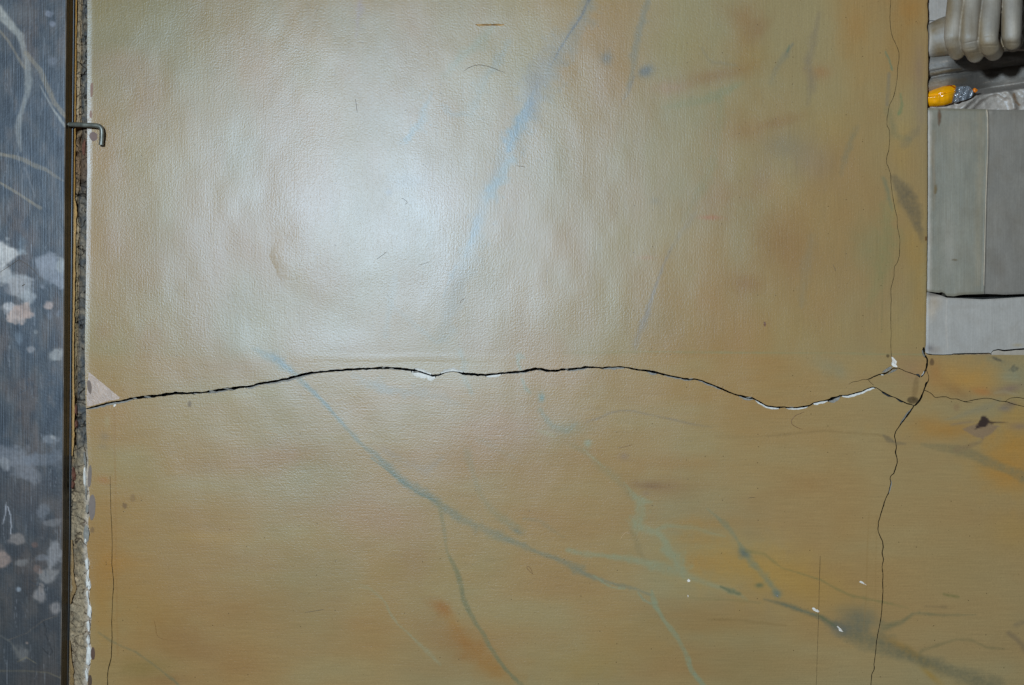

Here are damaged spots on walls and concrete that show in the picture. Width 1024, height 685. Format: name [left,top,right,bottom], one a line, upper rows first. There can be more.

crack [943,292,1024,300]
crack [88,347,1024,685]